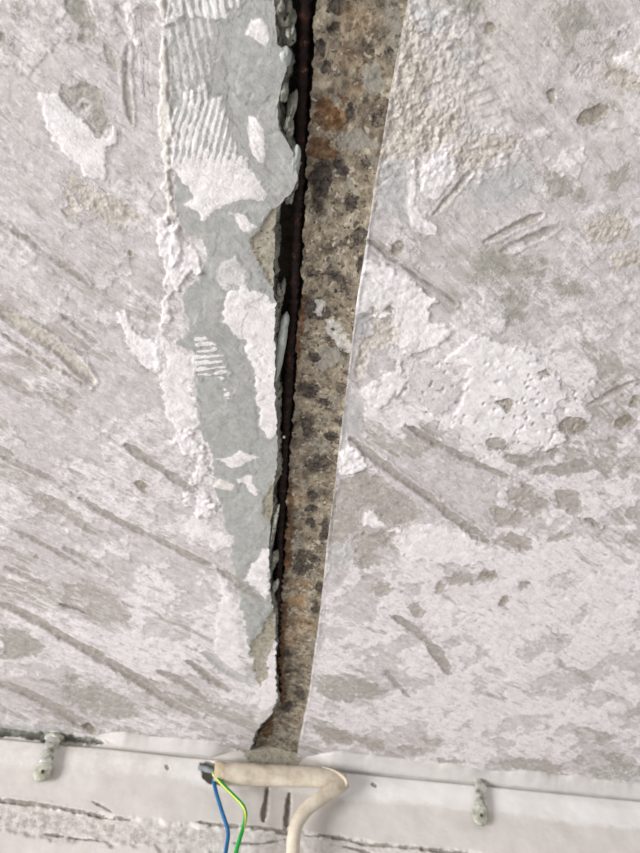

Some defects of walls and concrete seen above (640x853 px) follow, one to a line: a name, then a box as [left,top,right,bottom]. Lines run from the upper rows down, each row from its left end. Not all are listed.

spalling [0,0,317,750]
rust [258,0,354,741]